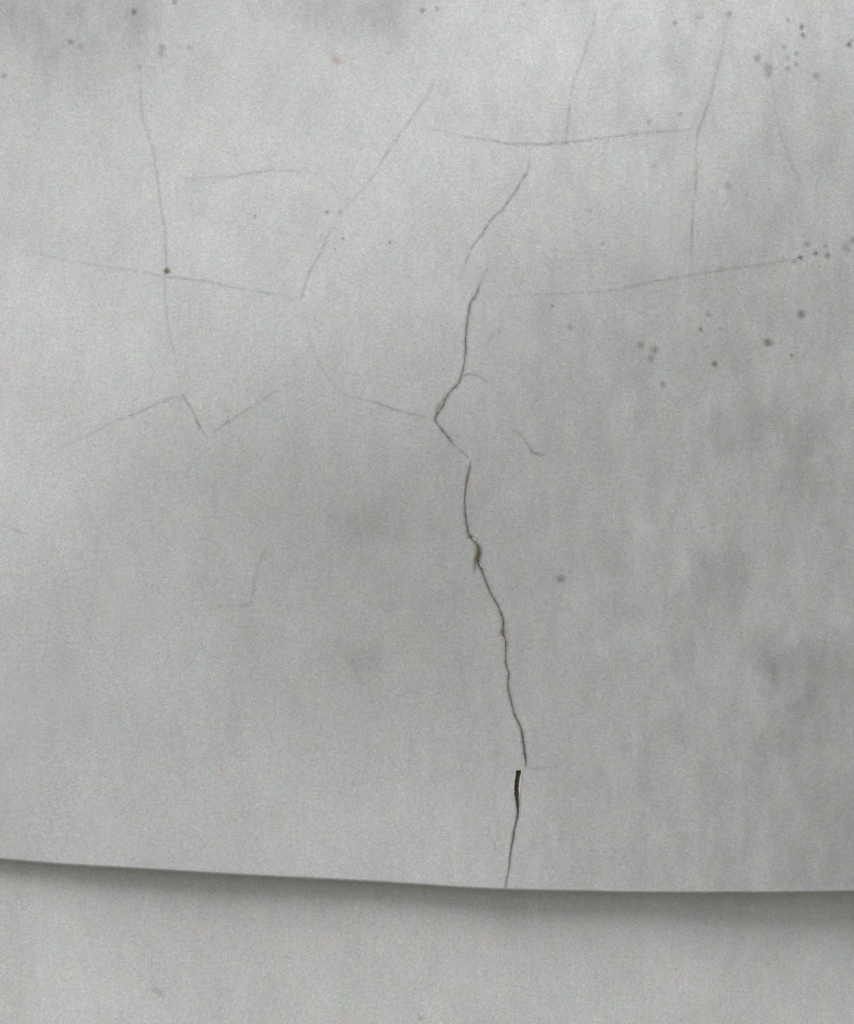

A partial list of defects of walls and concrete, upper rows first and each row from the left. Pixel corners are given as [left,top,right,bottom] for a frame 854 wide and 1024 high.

crack [435,281,527,879]